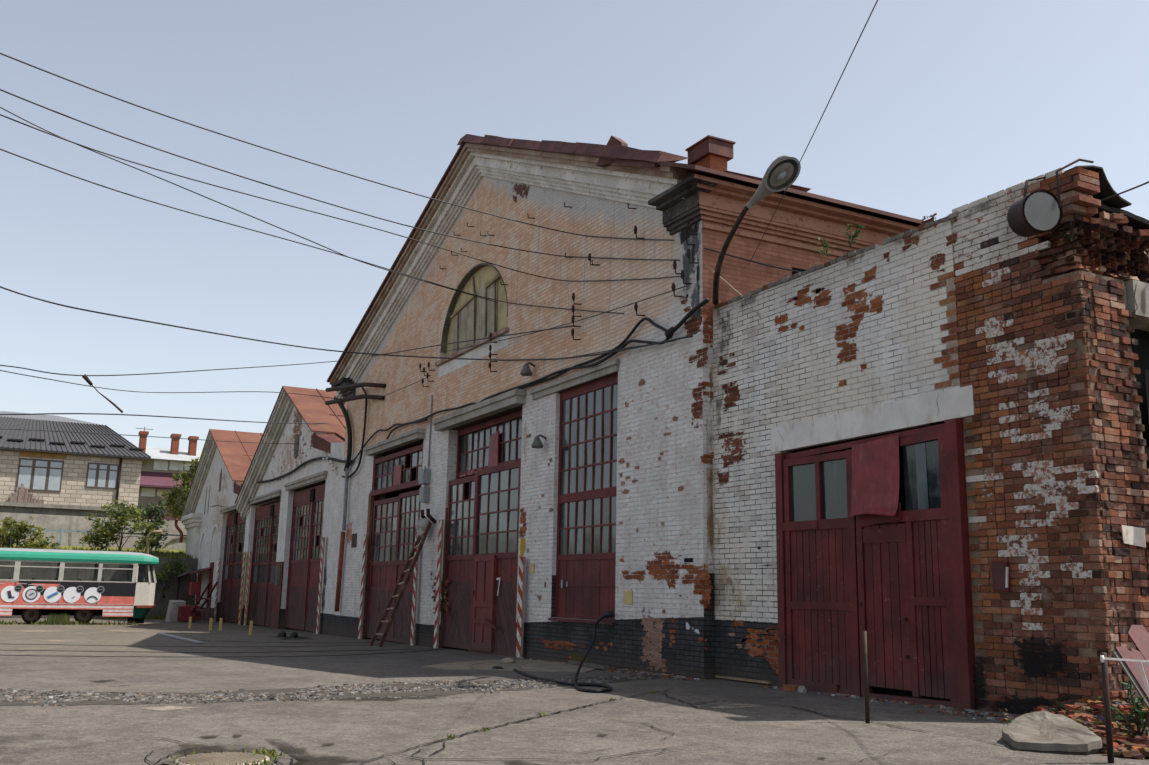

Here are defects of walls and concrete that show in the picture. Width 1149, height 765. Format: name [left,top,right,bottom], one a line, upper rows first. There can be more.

peeling [775,213,937,372]
peeling [700,432,747,486]
peeling [929,167,1149,713]
peeling [618,548,713,613]
peeling [639,607,677,673]
peeling [728,619,779,674]
crack [127,737,293,765]
crack [351,689,1005,765]